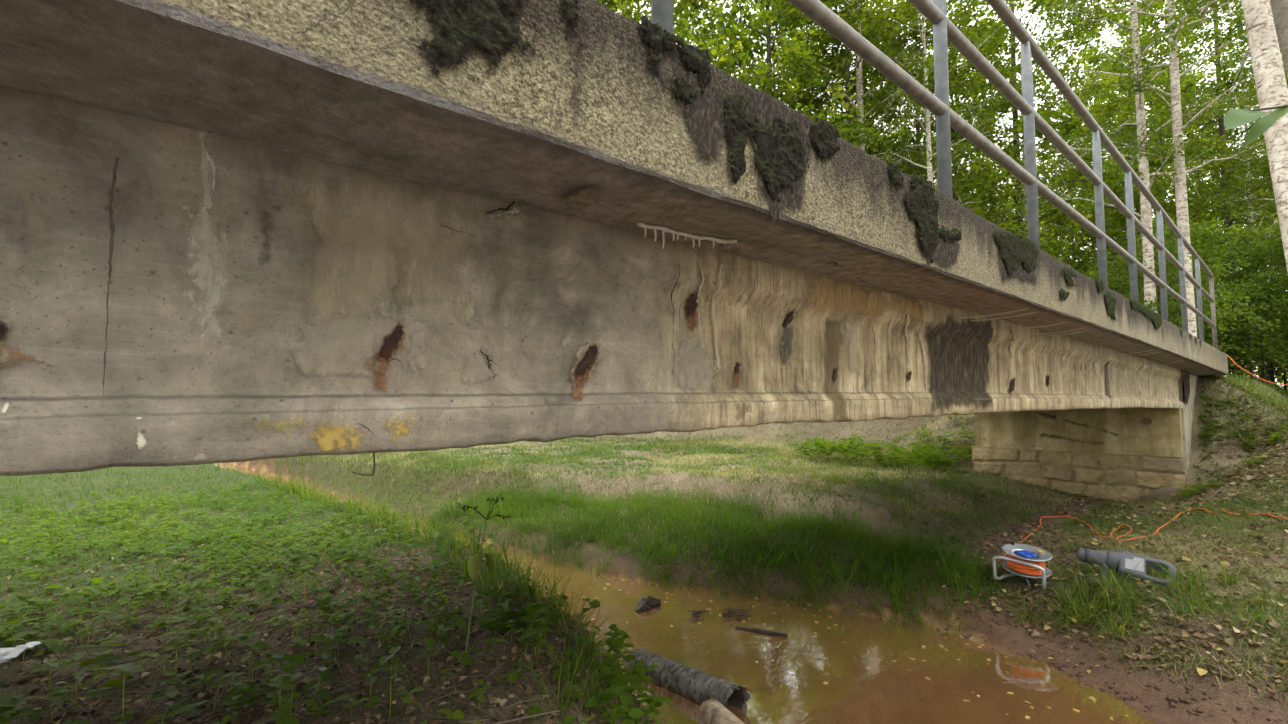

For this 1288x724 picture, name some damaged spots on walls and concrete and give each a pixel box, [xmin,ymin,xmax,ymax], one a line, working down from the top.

leakage [658,65,727,162]
leakage [746,91,811,222]
crack [103,157,119,396]
leakage [932,231,960,268]
leakage [998,260,1036,284]
leakage [888,314,993,412]
leakage [1104,361,1113,397]